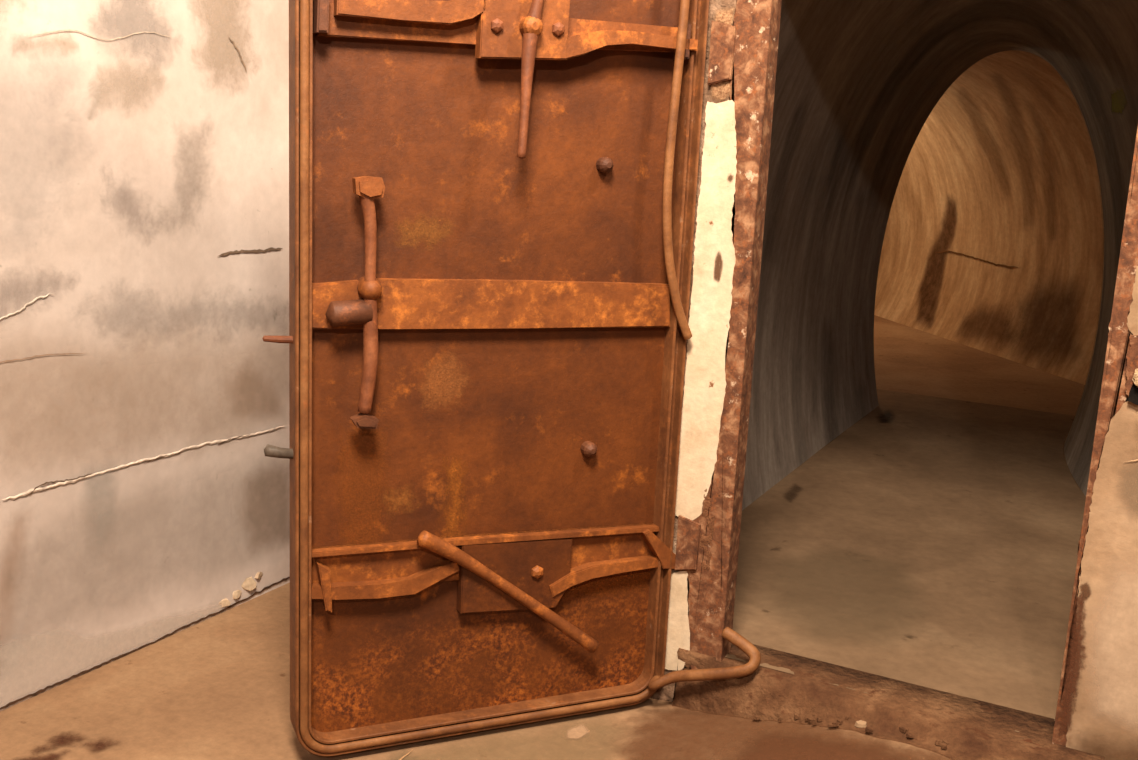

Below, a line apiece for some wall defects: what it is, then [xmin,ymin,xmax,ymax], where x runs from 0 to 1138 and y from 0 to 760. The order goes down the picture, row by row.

water stain [104,0,167,53]
crack [0,293,54,320]
crack [0,353,84,363]
crack [2,426,283,500]
spalling [699,489,720,570]
rust [565,569,650,595]
rust [1058,594,1085,736]
water stain [623,707,953,760]